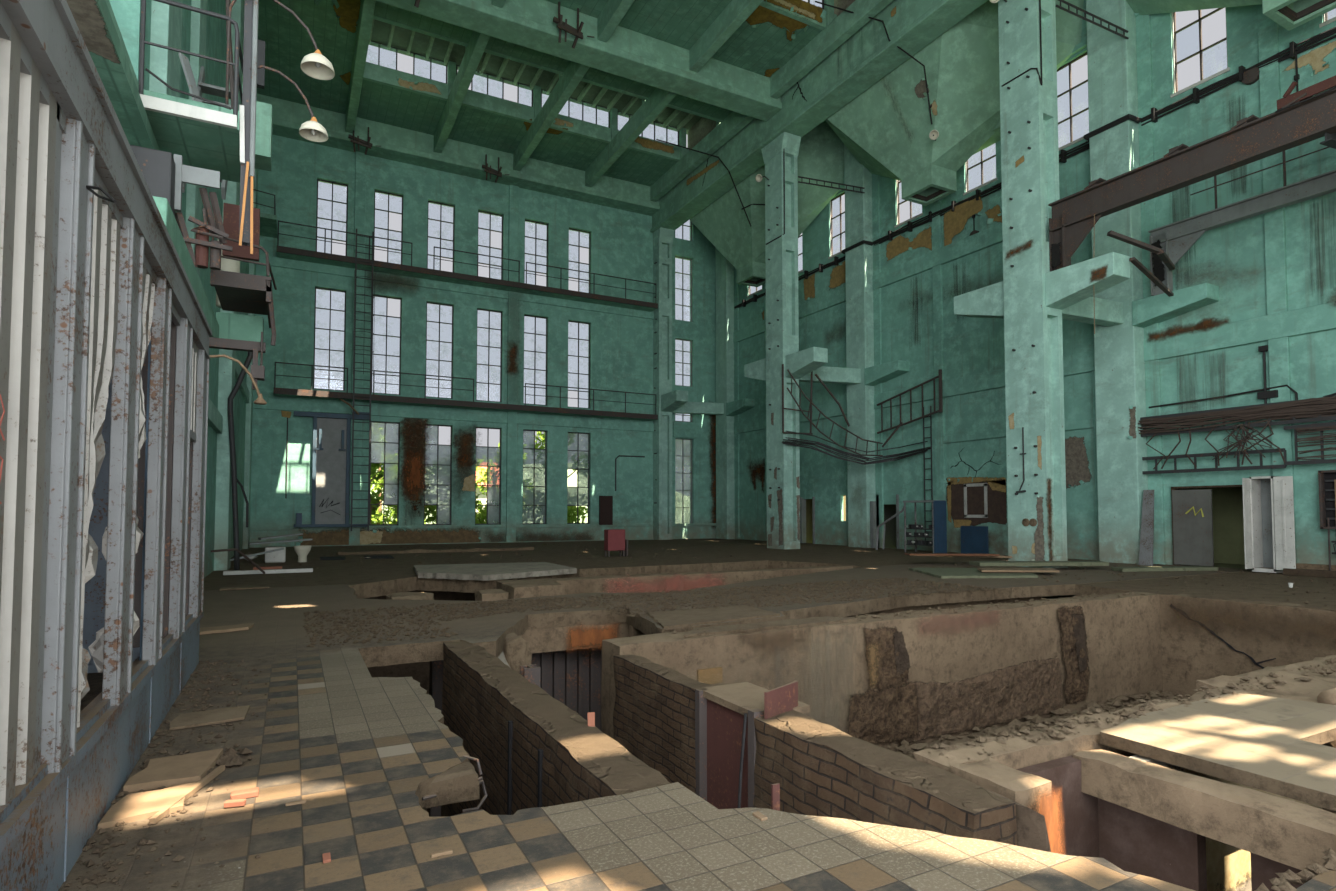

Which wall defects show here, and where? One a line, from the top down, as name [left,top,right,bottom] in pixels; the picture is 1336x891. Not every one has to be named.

peeling [764,0,827,39]
peeling [883,197,1002,263]
corrosion [1148,318,1228,341]
crack [1170,604,1276,669]